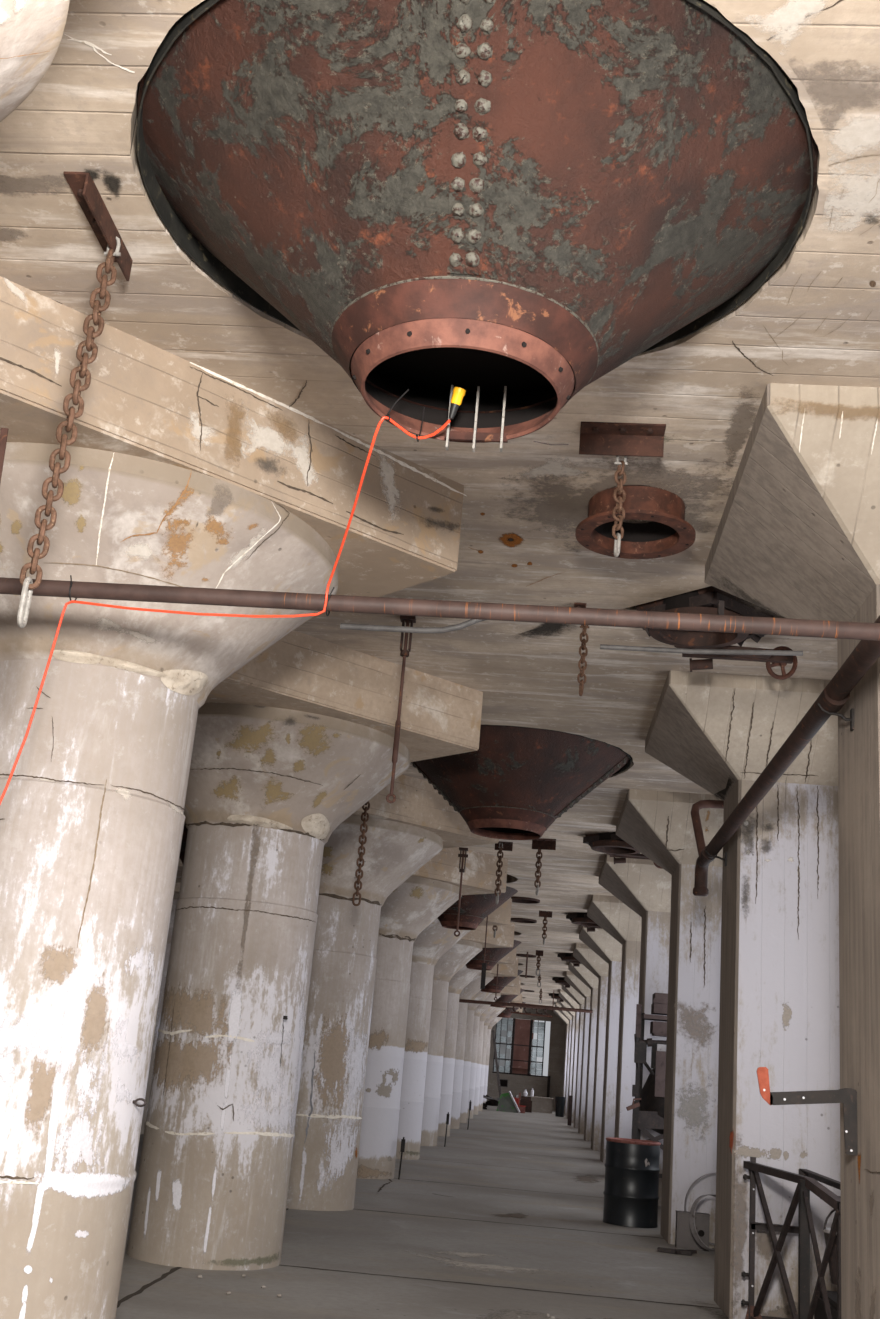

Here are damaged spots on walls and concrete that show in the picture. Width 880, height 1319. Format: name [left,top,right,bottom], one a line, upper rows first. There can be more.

water stain [747,0,825,43]
crack [828,154,880,236]
crack [121,367,376,542]
crack [250,505,290,556]
peeling [214,720,341,804]
peeling [0,946,232,1179]
peeling [366,1069,399,1098]
crack [0,1173,34,1181]